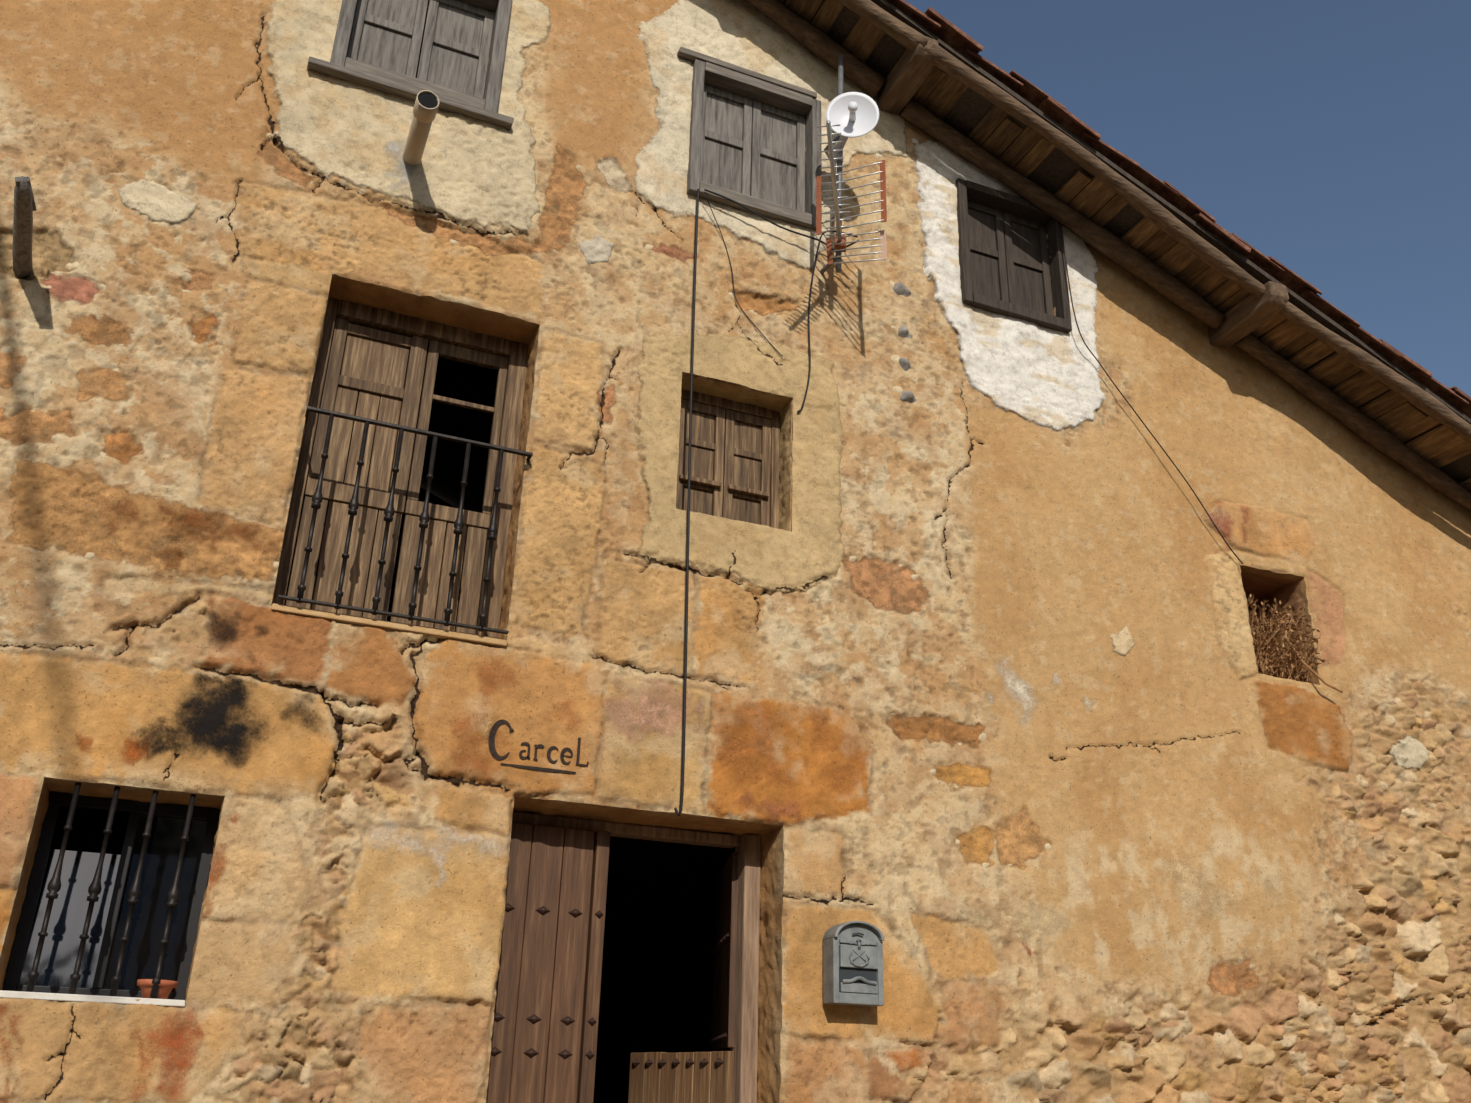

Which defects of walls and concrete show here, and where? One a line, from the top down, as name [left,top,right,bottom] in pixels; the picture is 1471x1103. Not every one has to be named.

crack [236,12,524,236]
crack [216,180,242,263]
water stain [123,675,264,765]
crack [1049,731,1240,767]